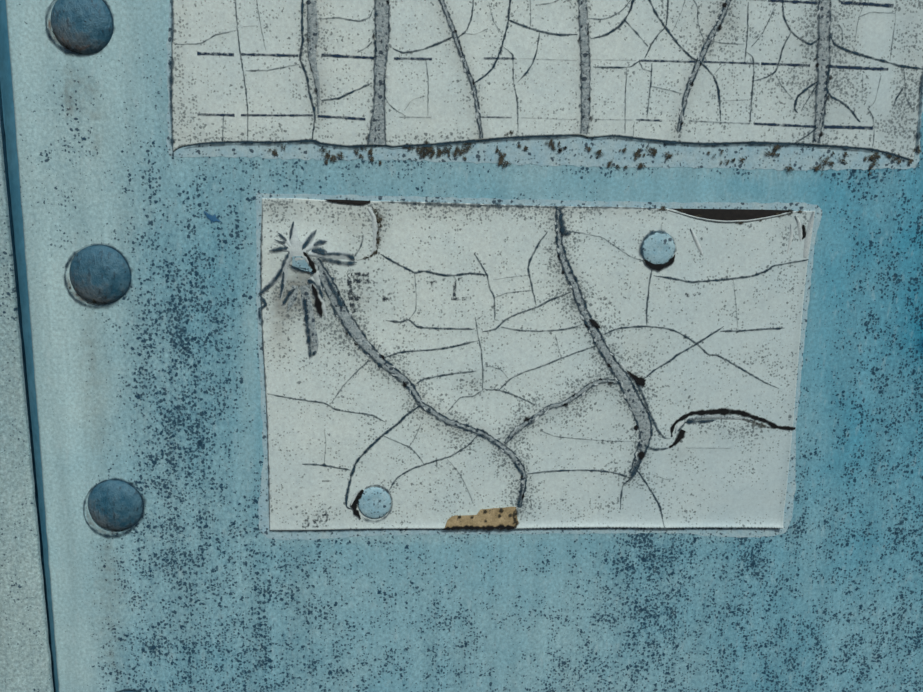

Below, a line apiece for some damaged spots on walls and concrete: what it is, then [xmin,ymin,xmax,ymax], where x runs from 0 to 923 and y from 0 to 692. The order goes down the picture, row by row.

crack [169,0,923,162]
crack [260,201,809,532]
peeling [442,507,519,531]